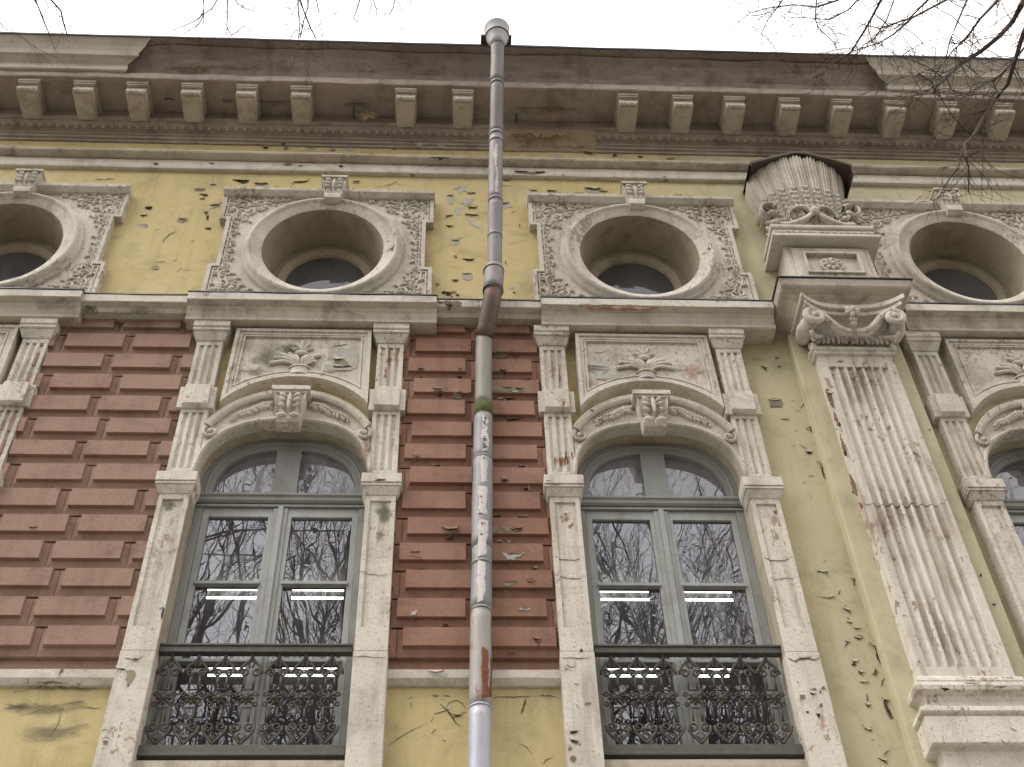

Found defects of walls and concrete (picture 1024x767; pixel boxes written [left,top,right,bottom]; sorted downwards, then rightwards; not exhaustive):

peeling [422,143,513,208]
peeling [194,183,221,229]
peeling [436,185,480,310]
spalling [769,398,783,408]
peeling [476,414,529,603]
crack [864,502,939,510]
peeling [818,591,863,648]
leakage [9,705,67,738]
crack [388,694,466,746]
rust [481,646,492,697]
spalling [800,686,825,727]
spalling [851,658,893,719]